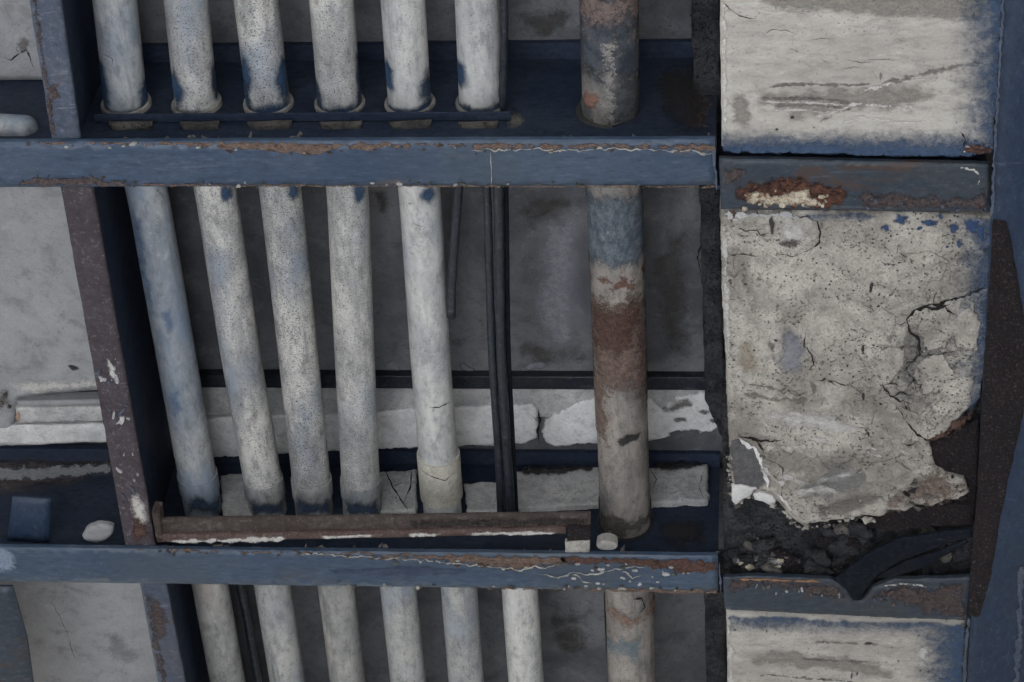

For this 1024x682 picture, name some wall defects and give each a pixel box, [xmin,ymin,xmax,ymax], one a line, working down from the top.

rust [26,0,716,158]
spalling [724,209,797,240]
rust [736,176,988,213]
rust [589,255,648,458]
crack [803,229,987,466]
crack [385,471,412,510]
crack [742,437,784,503]
spalling [722,254,922,577]
spalling [862,299,982,576]
rust [241,550,845,647]
rust [871,583,967,622]